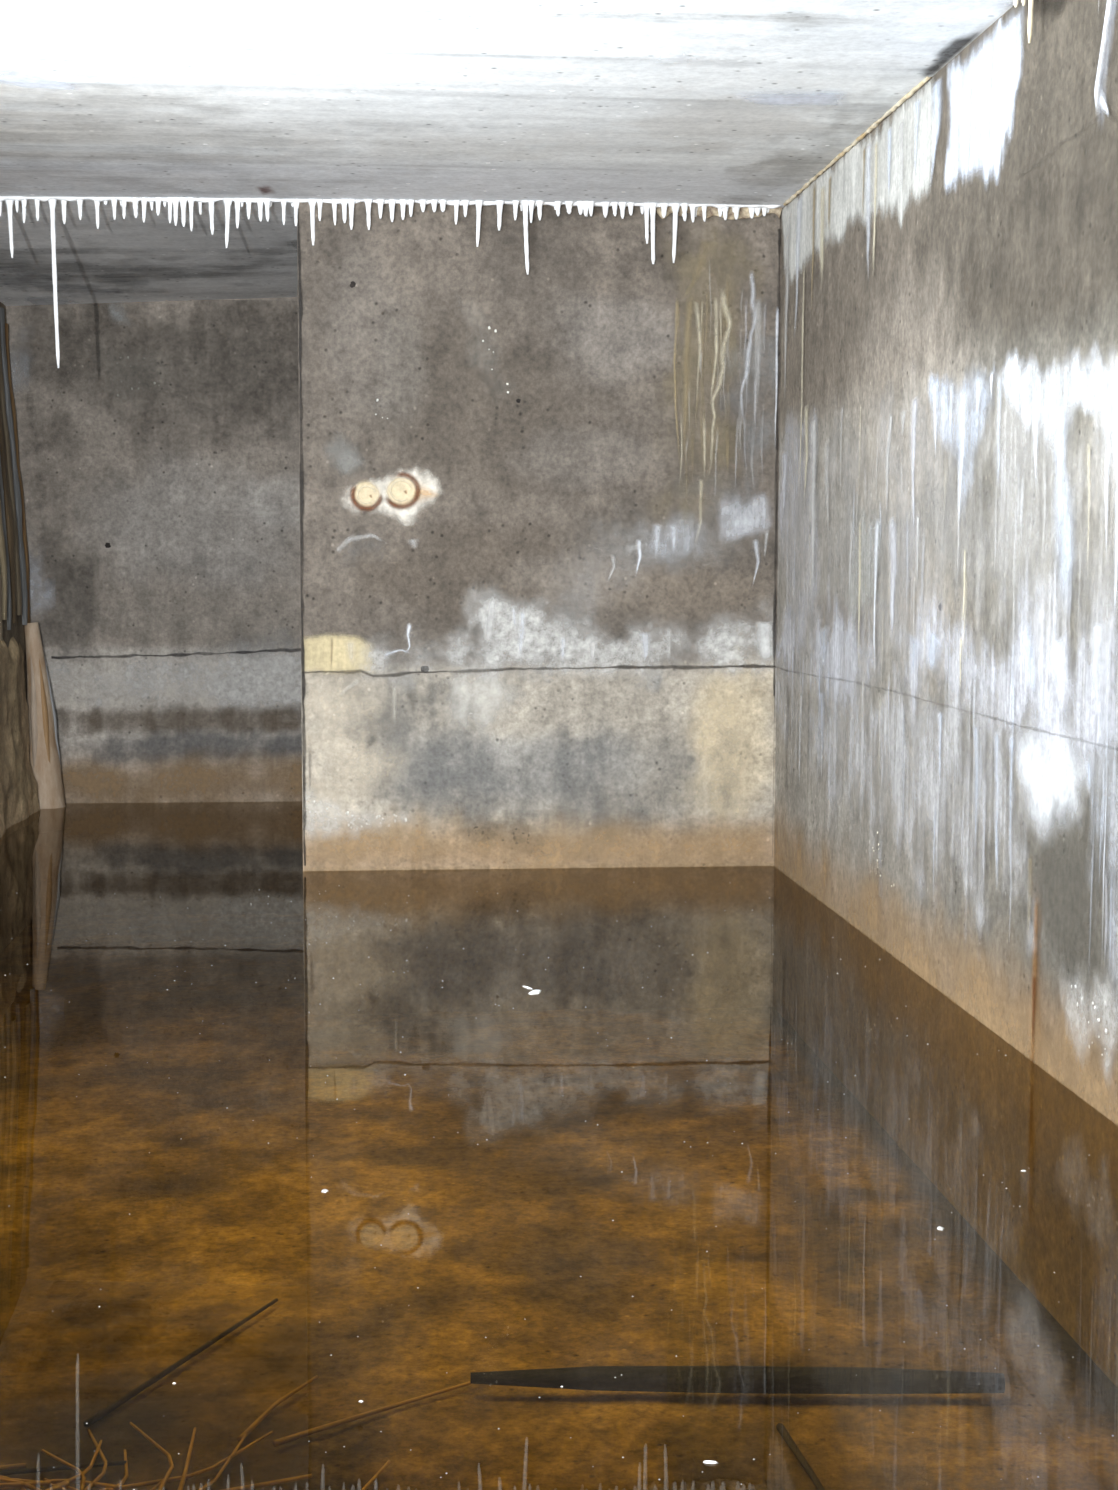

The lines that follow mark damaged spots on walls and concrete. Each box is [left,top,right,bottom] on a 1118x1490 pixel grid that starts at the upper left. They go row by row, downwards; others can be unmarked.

damp [1094,0,1110,113]
damp [0,19,1021,399]
rust [349,471,438,522]
damp [735,407,815,580]
damp [886,380,977,572]
damp [991,357,1118,595]
damp [454,600,677,722]
damp [700,619,794,704]
damp [784,516,1117,852]
damp [847,832,1118,1126]